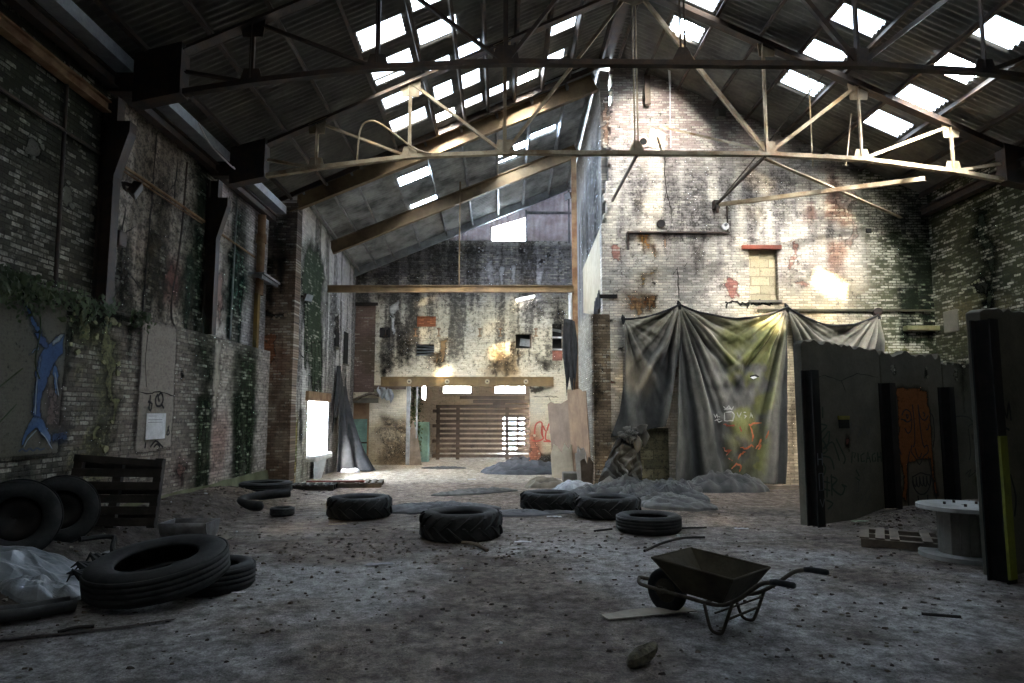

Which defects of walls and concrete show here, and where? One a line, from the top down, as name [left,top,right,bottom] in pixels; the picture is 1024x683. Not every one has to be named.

corrosion [637,234,666,258]
damp [32,180,204,372]
damp [486,261,516,284]
corrosion [625,271,657,316]
peeling [723,277,741,299]
damp [375,274,409,377]
damp [488,344,557,376]